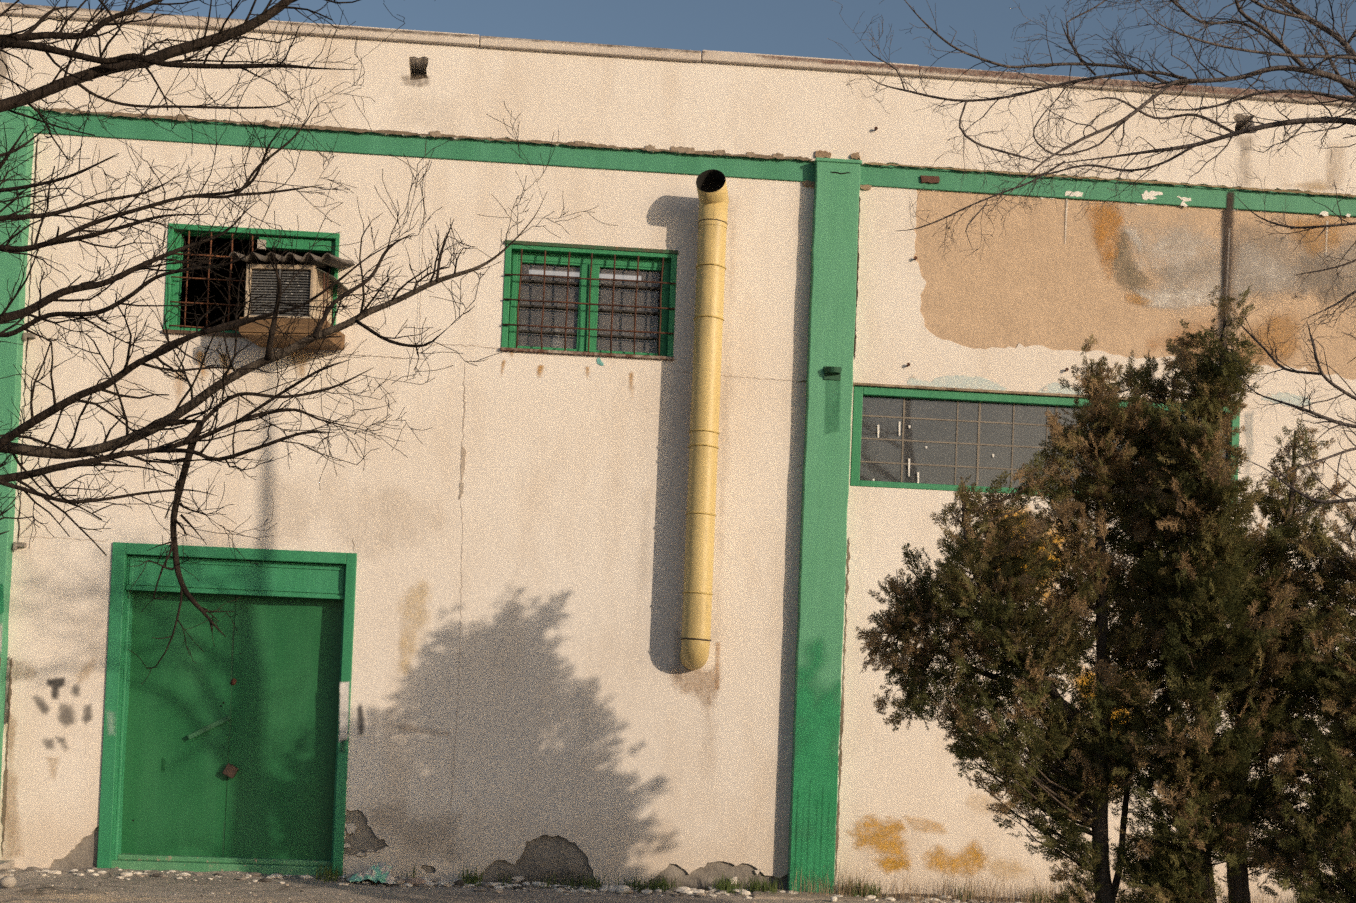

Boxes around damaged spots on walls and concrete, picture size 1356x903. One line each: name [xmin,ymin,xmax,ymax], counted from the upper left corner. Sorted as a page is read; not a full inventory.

spalling [42,108,832,161]
peeling [850,152,1356,380]
crack [340,343,496,806]
spalling [50,826,99,872]
spalling [344,809,388,854]
spalling [478,835,598,886]
spalling [647,861,787,889]